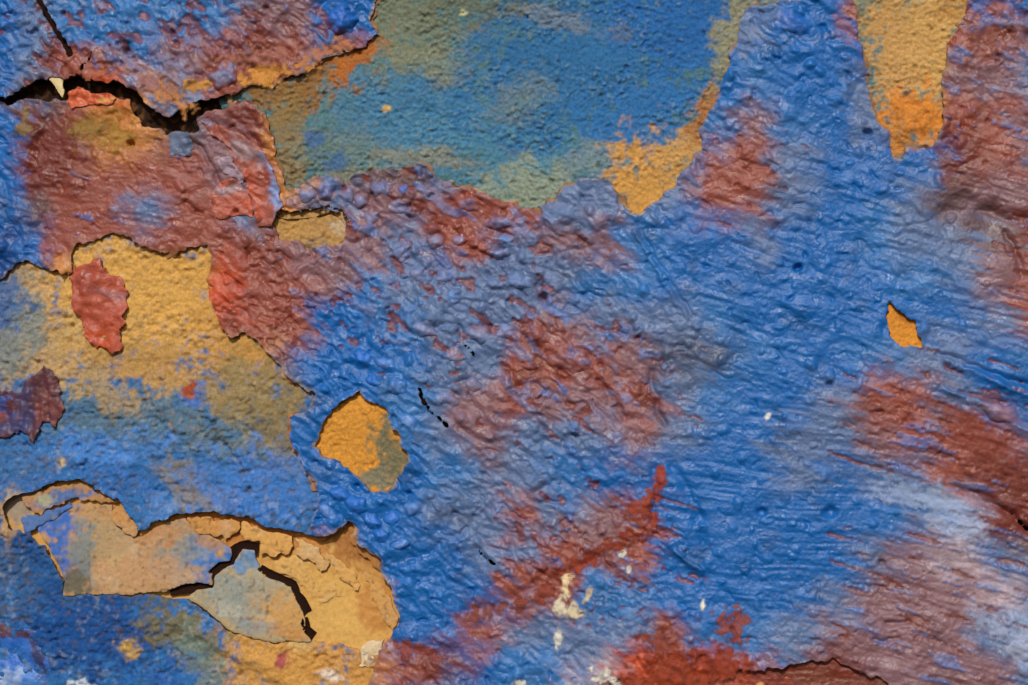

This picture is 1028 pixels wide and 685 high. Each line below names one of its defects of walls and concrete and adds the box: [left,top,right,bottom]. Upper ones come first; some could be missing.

crack [0,0,223,156]
spalling [201,0,778,250]
spalling [852,0,967,159]
peeling [886,302,922,348]
peeling [0,233,409,685]